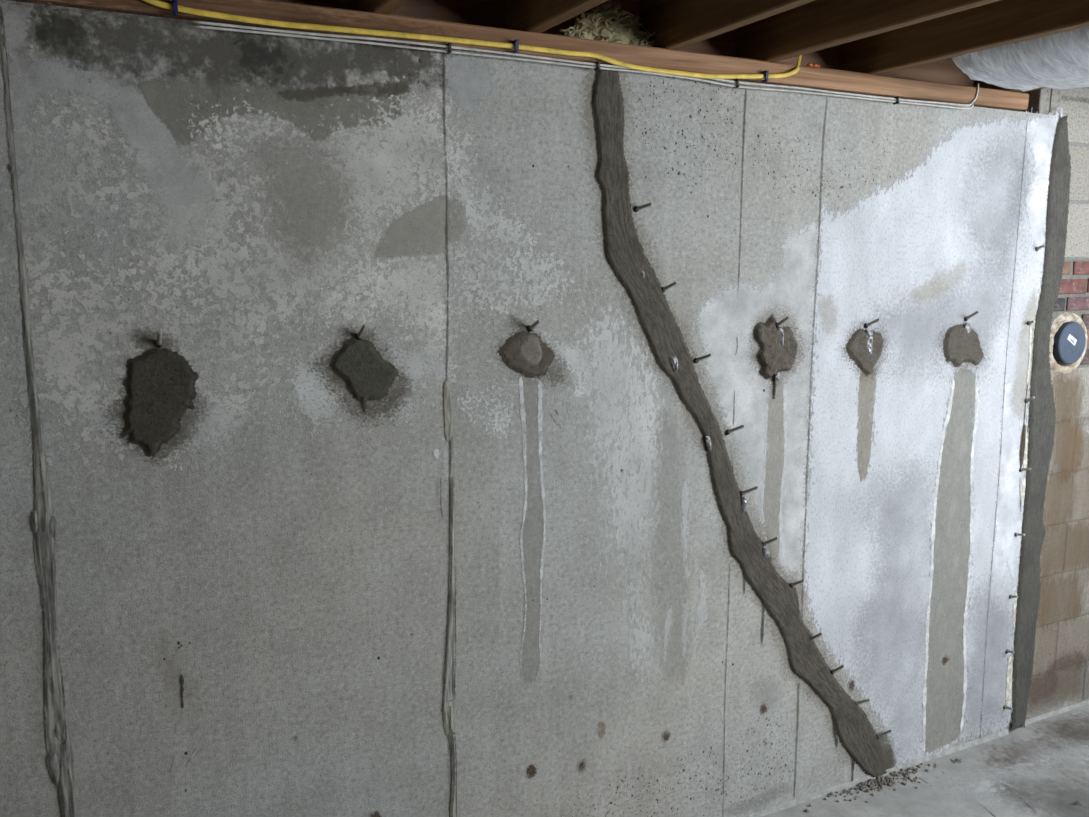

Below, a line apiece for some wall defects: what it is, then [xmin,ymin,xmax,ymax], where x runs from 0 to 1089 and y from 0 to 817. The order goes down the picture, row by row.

crack [32,374,74,817]
damp [0,0,708,701]
crack [440,477,457,817]
crack [737,89,747,299]
crack [793,683,801,797]
crack [804,404,812,481]
crack [817,126,825,243]
damp [697,108,1063,767]